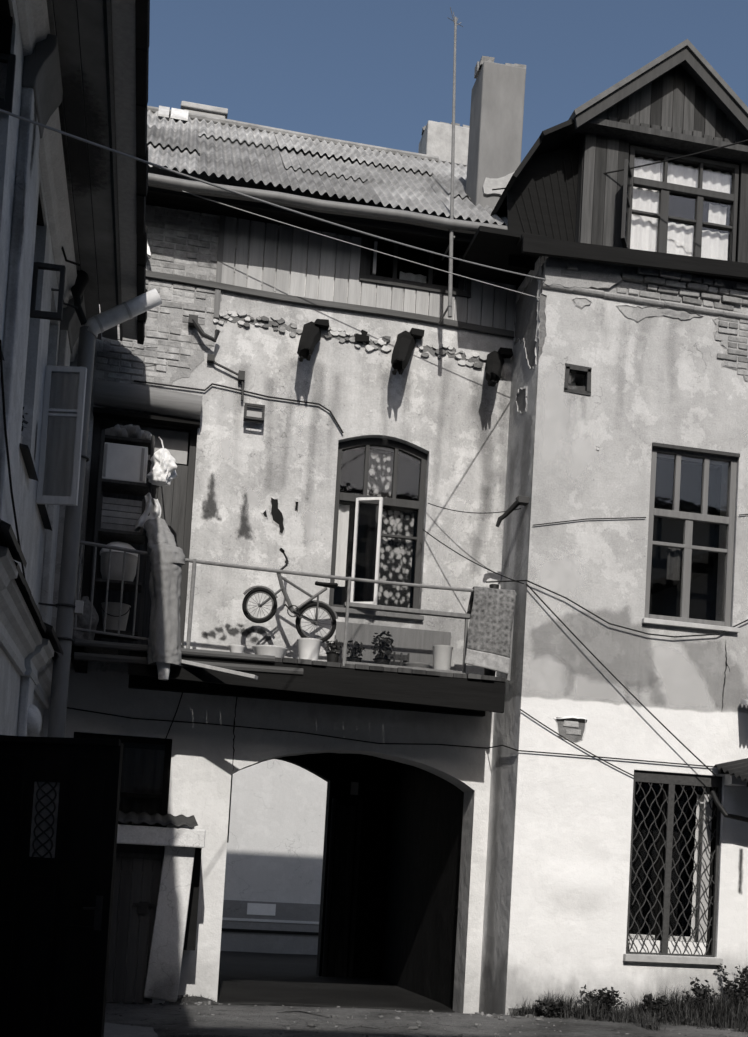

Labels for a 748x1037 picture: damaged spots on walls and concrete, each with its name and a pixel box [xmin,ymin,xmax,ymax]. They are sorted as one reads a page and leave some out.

spalling [571,297,592,310]
spalling [616,305,748,383]
leakage [203,475,220,519]
leakage [238,495,250,538]
crack [722,644,730,708]